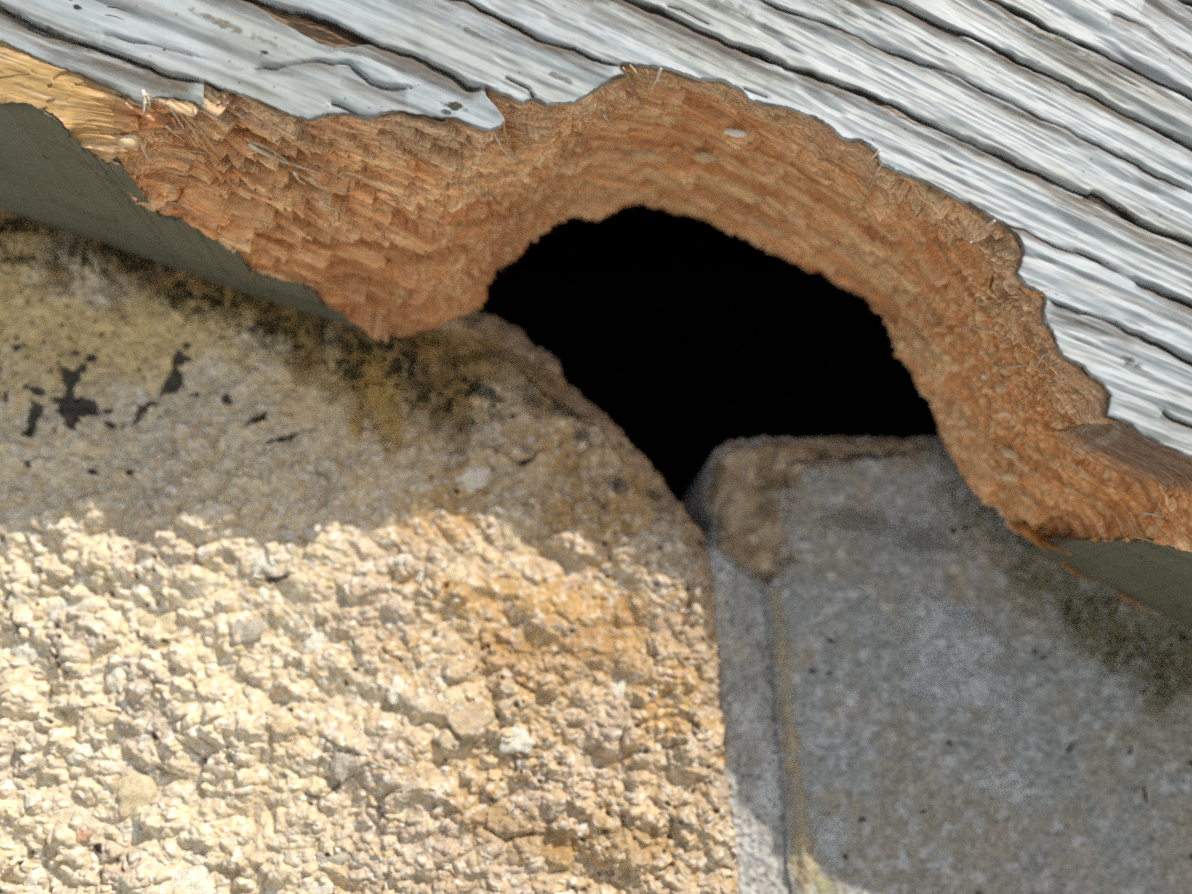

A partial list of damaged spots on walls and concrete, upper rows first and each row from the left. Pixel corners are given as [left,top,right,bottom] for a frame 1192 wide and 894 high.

crack [611,0,1192,255]
peeling [1080,197,1136,223]
crack [1008,225,1109,269]
crack [1140,287,1192,315]
crack [1051,301,1192,365]
spalling [21,343,199,437]
crack [1161,412,1192,430]
crack [844,453,878,461]
spalling [705,436,937,583]